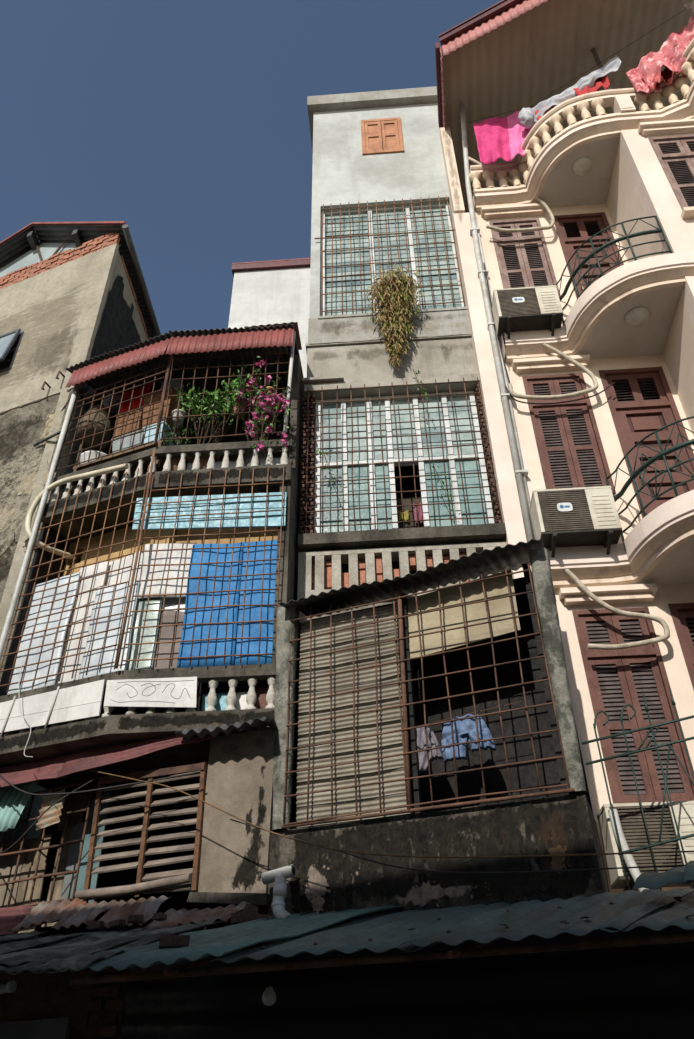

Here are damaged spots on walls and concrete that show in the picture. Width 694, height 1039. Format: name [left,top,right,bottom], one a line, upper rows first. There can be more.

water stain [0,416,42,506]
water stain [232,786,266,890]
flaking render [305,864,330,913]
flaking render [394,881,477,907]
water stain [288,797,596,914]